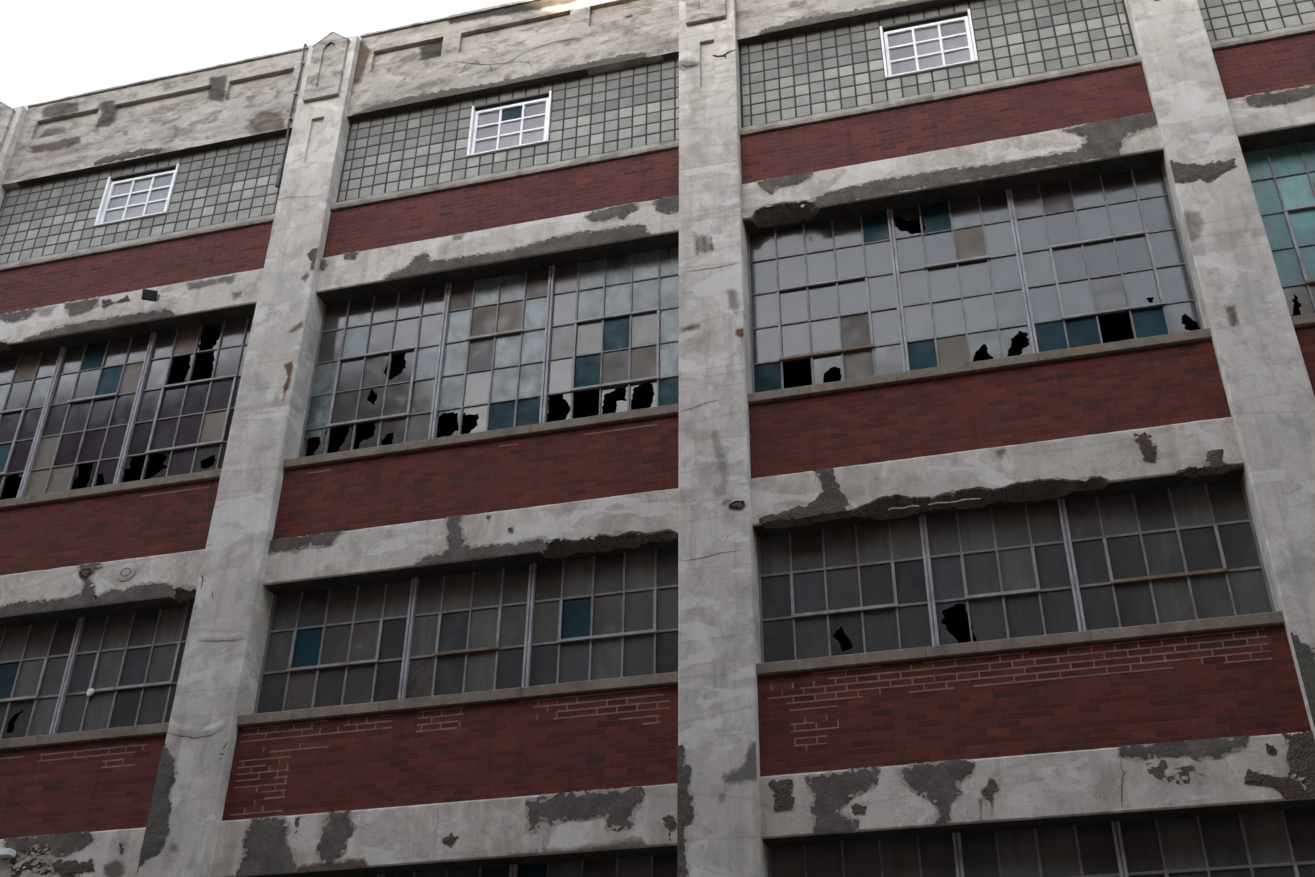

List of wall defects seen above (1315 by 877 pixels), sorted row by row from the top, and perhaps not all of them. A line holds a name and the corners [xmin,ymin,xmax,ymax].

peeling [413,515,678,566]
spalling [728,500,746,510]
spalling [759,468,1109,529]
spalling [1244,632,1315,800]
peeling [0,744,178,877]
peeling [229,714,393,877]
peeling [524,786,645,836]
peeling [662,744,697,877]
peeling [768,758,975,834]
peeling [1117,735,1251,785]